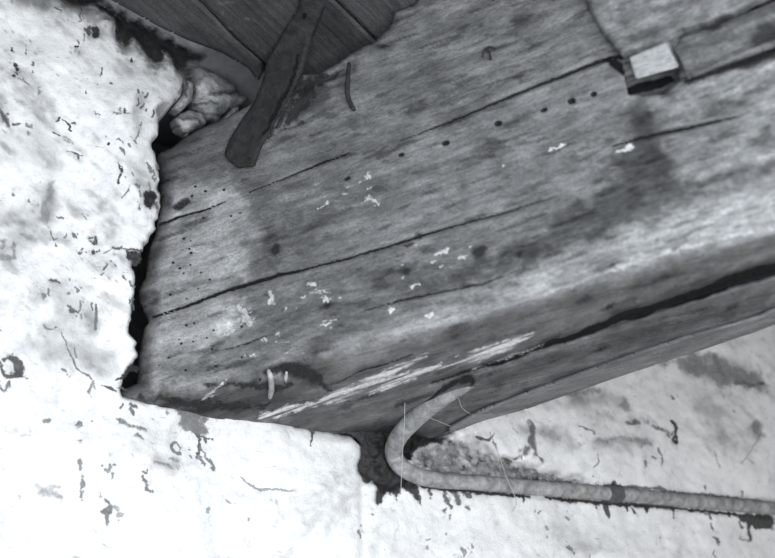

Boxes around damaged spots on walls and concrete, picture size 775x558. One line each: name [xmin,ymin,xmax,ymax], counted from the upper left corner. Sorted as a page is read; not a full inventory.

spalling [117,162,159,213]
spalling [126,251,142,266]
crack [152,198,551,318]
spalling [652,420,678,445]
spalling [403,434,563,482]